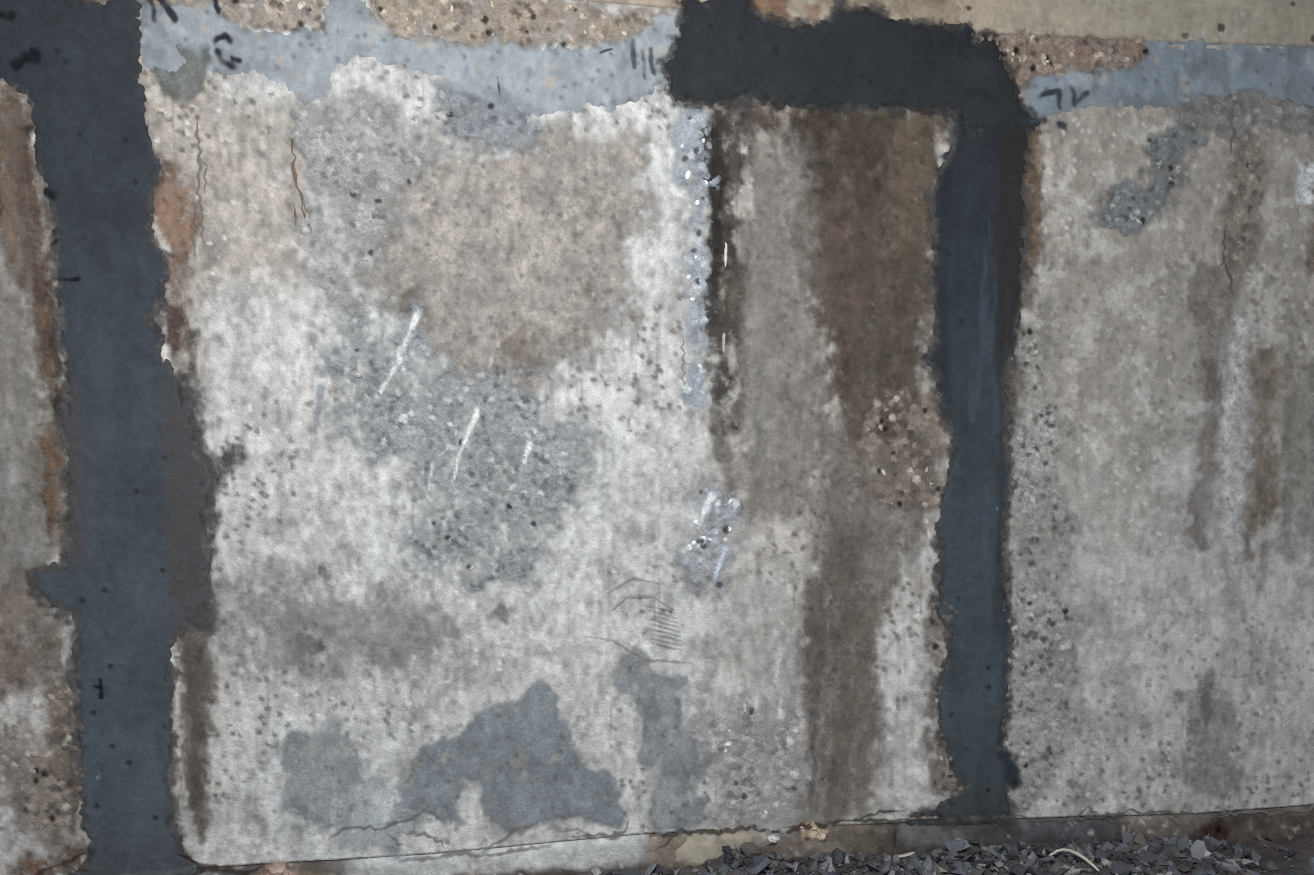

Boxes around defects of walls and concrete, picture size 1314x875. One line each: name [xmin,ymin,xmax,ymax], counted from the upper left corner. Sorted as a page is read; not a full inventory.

spalling [370,0,670,53]
spalling [971,29,1148,98]
water stain [0,287,53,591]
water stain [698,101,947,834]
water stain [1189,264,1253,574]
crack [328,801,1189,861]